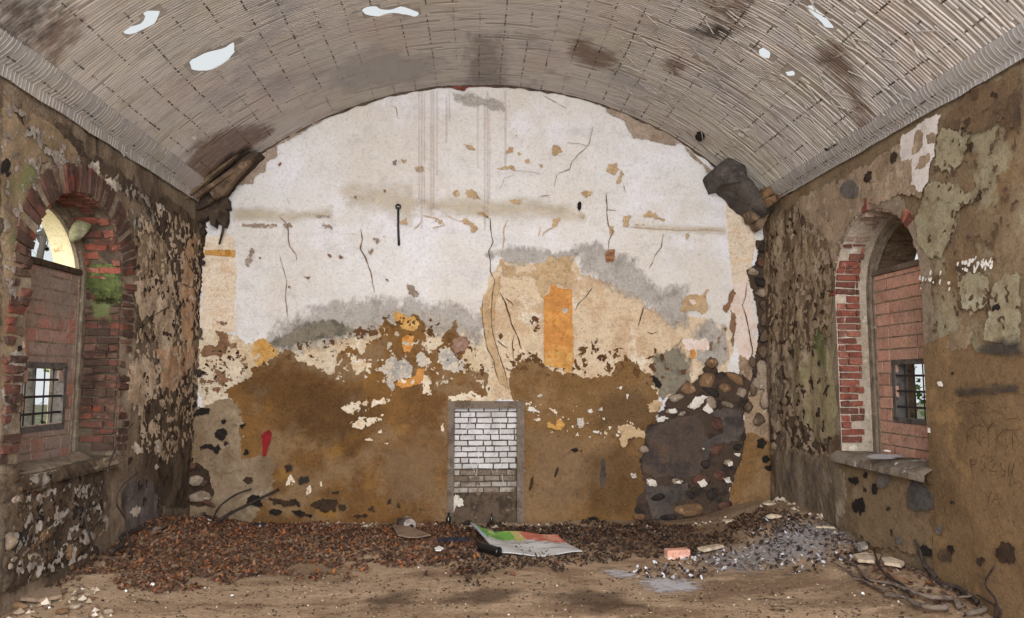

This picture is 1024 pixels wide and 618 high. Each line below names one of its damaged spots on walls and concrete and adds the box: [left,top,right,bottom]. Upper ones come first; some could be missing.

damp [209,147,254,183]
crack [500,128,593,196]
flaking render [912,130,939,155]
flaking render [944,69,1023,155]
crack [360,231,375,293]
flaking render [952,216,1010,316]
damp [267,298,483,353]
crack [414,212,521,387]
flaking render [680,289,709,314]
flaking render [968,285,1010,329]
flaking render [148,413,163,438]
flaking render [154,423,181,485]